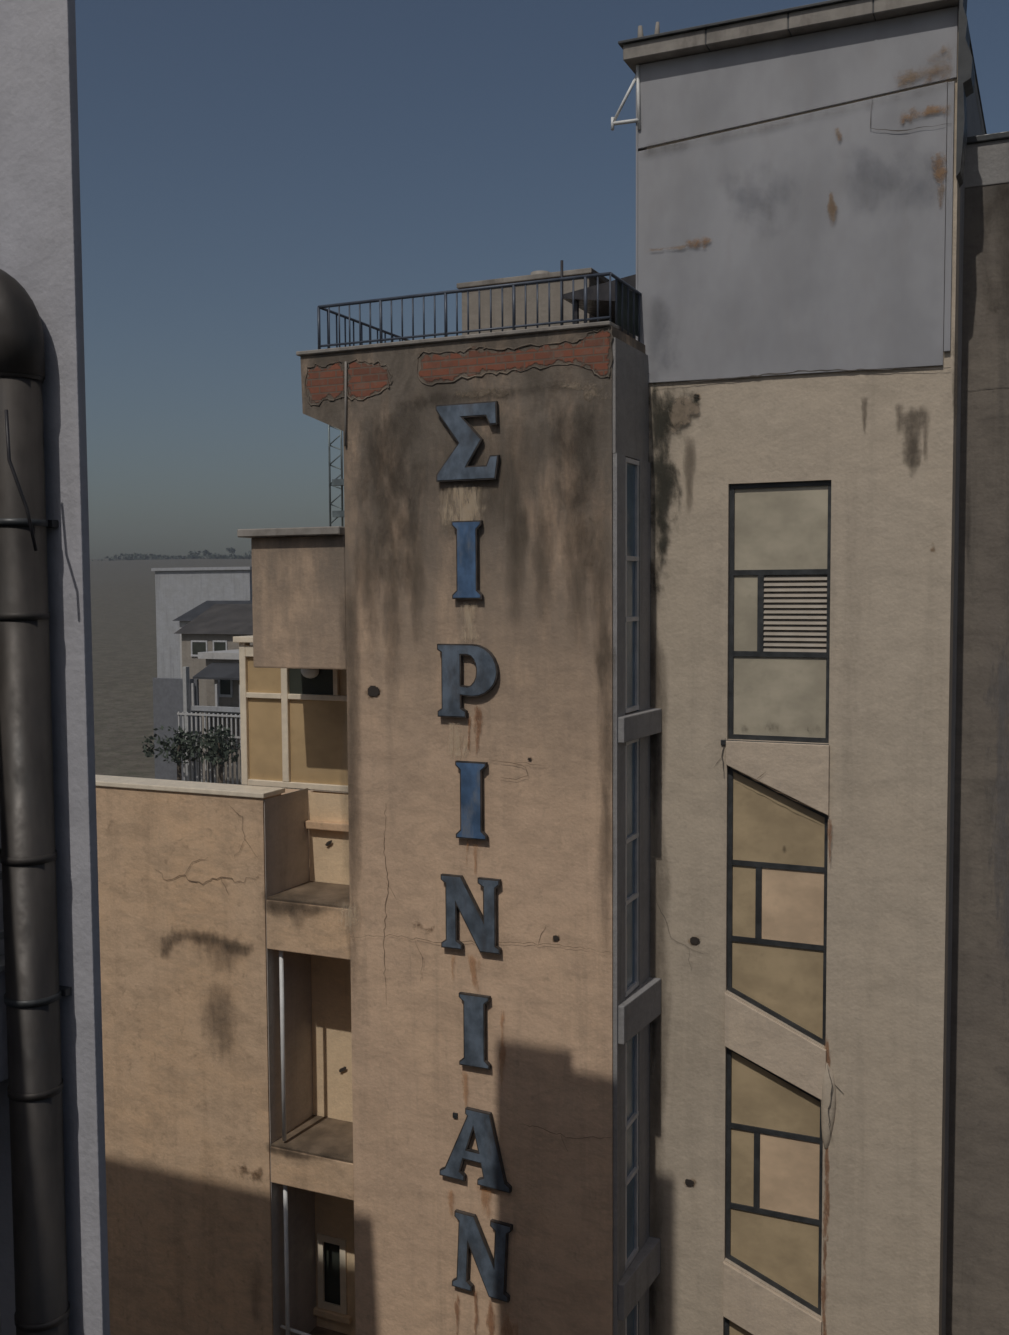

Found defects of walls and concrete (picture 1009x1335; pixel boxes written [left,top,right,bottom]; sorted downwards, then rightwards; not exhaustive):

flaking render [304,359,393,406]
flaking render [416,326,613,400]
damp [444,486,477,521]
damp [648,386,699,590]
crack [160,805,257,893]
corrosion [455,1293,494,1335]